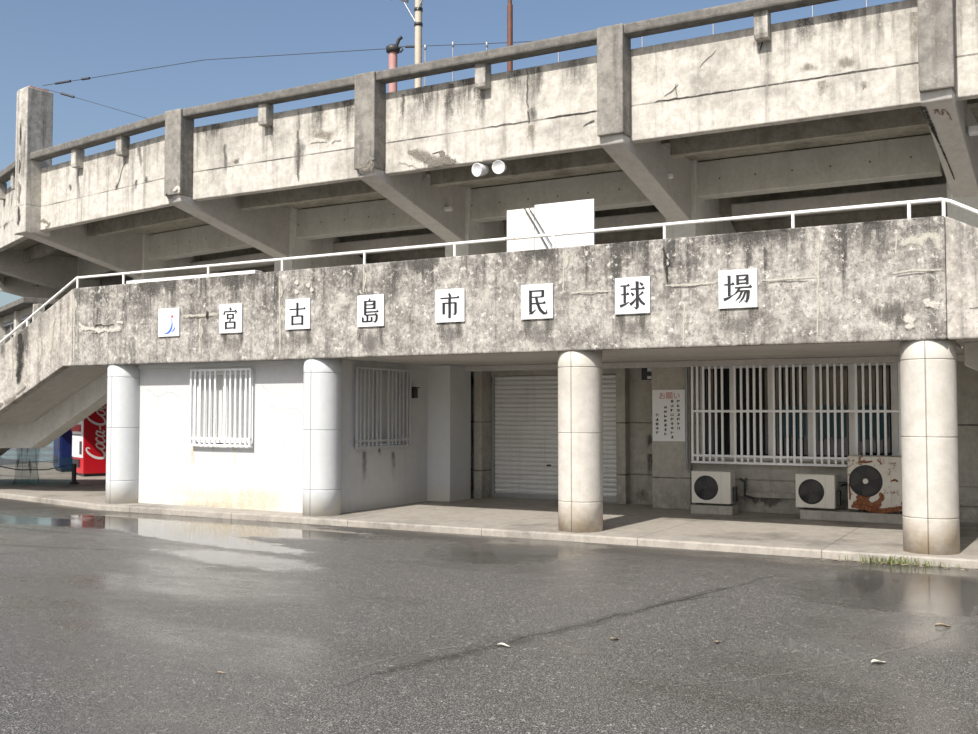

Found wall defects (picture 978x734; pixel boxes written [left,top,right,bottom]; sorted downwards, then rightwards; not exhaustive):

water stain [401,85,433,114]
water stain [445,78,483,110]
spalling [399,149,460,169]
water stain [1,326,28,384]